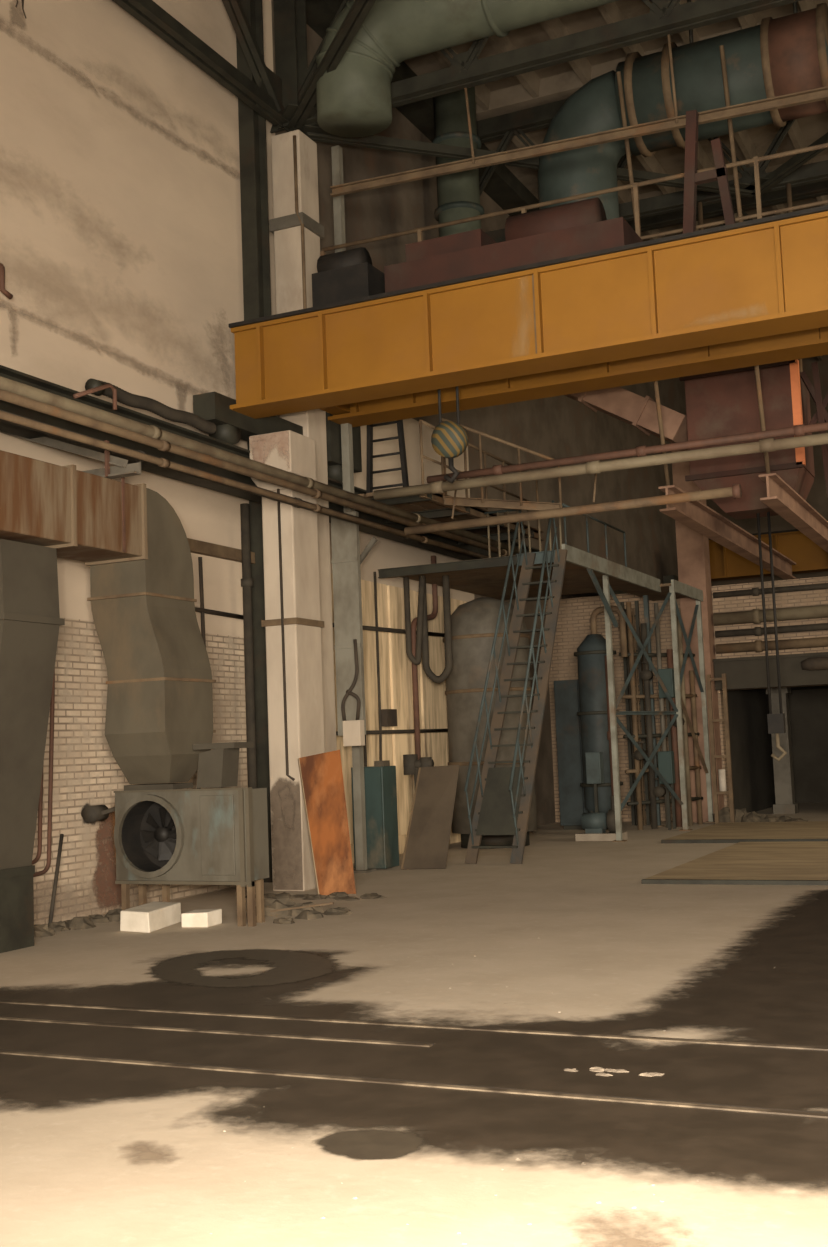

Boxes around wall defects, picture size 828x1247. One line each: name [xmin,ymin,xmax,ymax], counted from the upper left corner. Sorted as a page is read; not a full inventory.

damp [0,890,828,1189]